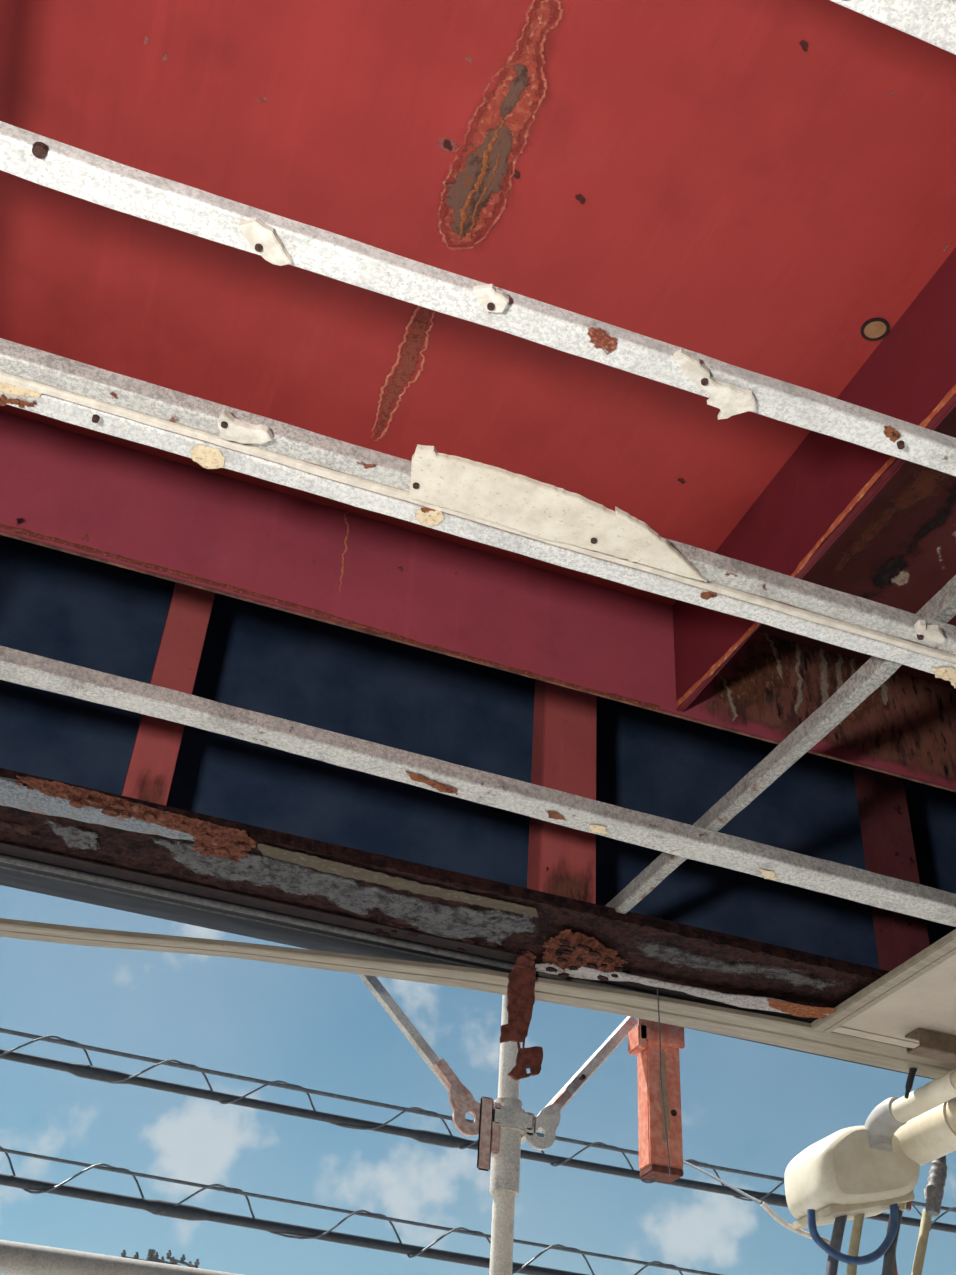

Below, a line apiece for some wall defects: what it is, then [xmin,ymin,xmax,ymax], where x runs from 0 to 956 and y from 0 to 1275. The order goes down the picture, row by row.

peeling [438,0,564,251]
rust [0,394,37,408]
rust [918,384,956,428]
rust [791,426,901,577]
rust [15,775,256,862]
rust [372,920,640,1081]